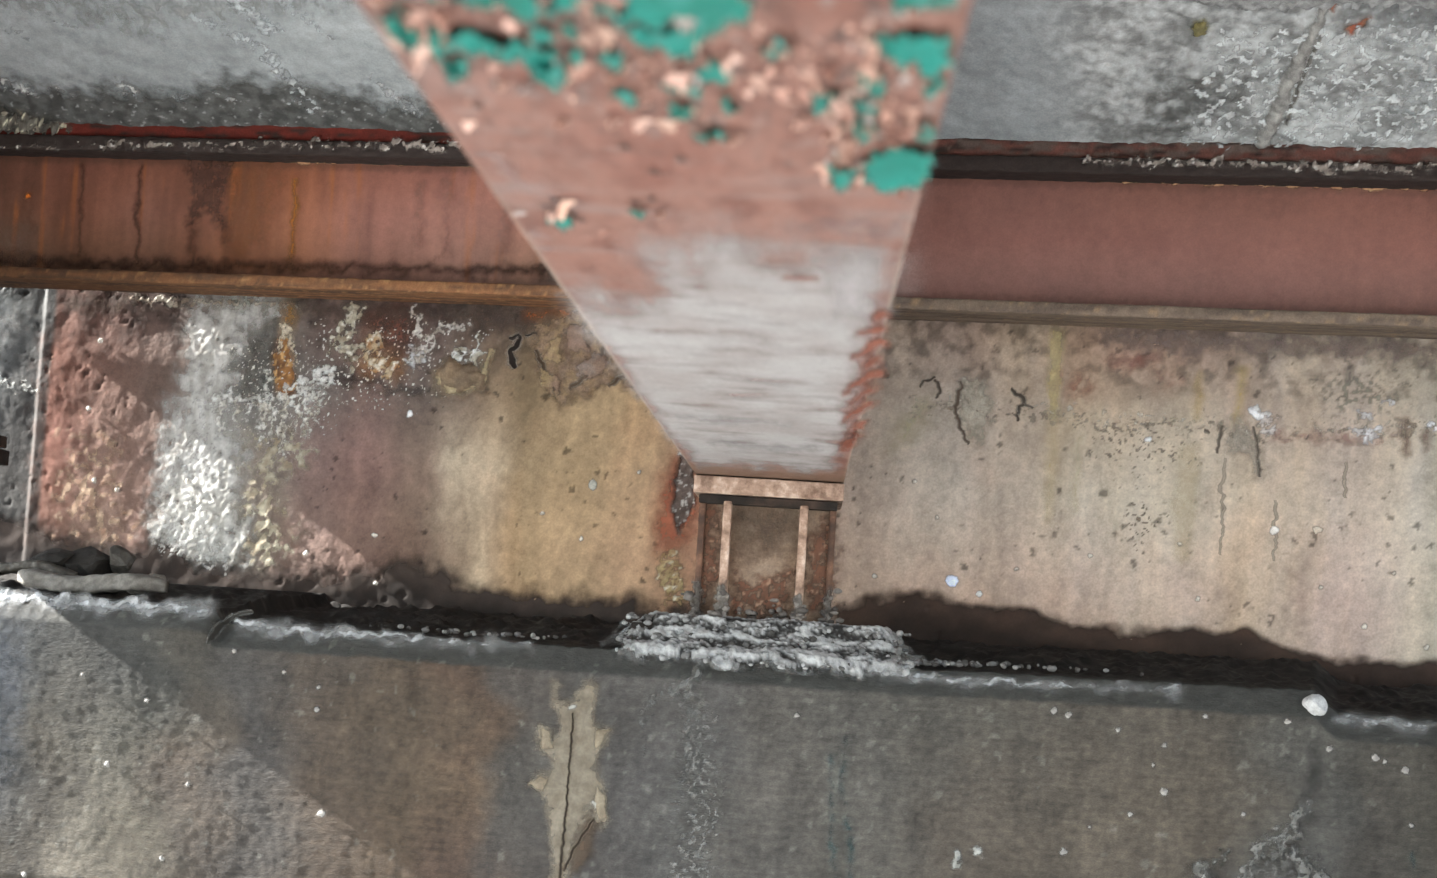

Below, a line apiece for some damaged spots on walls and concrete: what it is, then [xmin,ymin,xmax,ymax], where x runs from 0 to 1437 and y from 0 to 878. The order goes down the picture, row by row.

leakage [0,0,333,114]
peeling [370,0,957,198]
corrosion [187,160,234,249]
peeling [512,198,610,239]
corrosion [272,301,298,395]
peeling [532,242,883,472]
crack [919,376,942,399]
crack [1011,388,1034,421]
leakage [0,292,1437,878]
corrosion [656,453,843,618]
peeling [530,680,611,878]
crack [558,713,596,878]